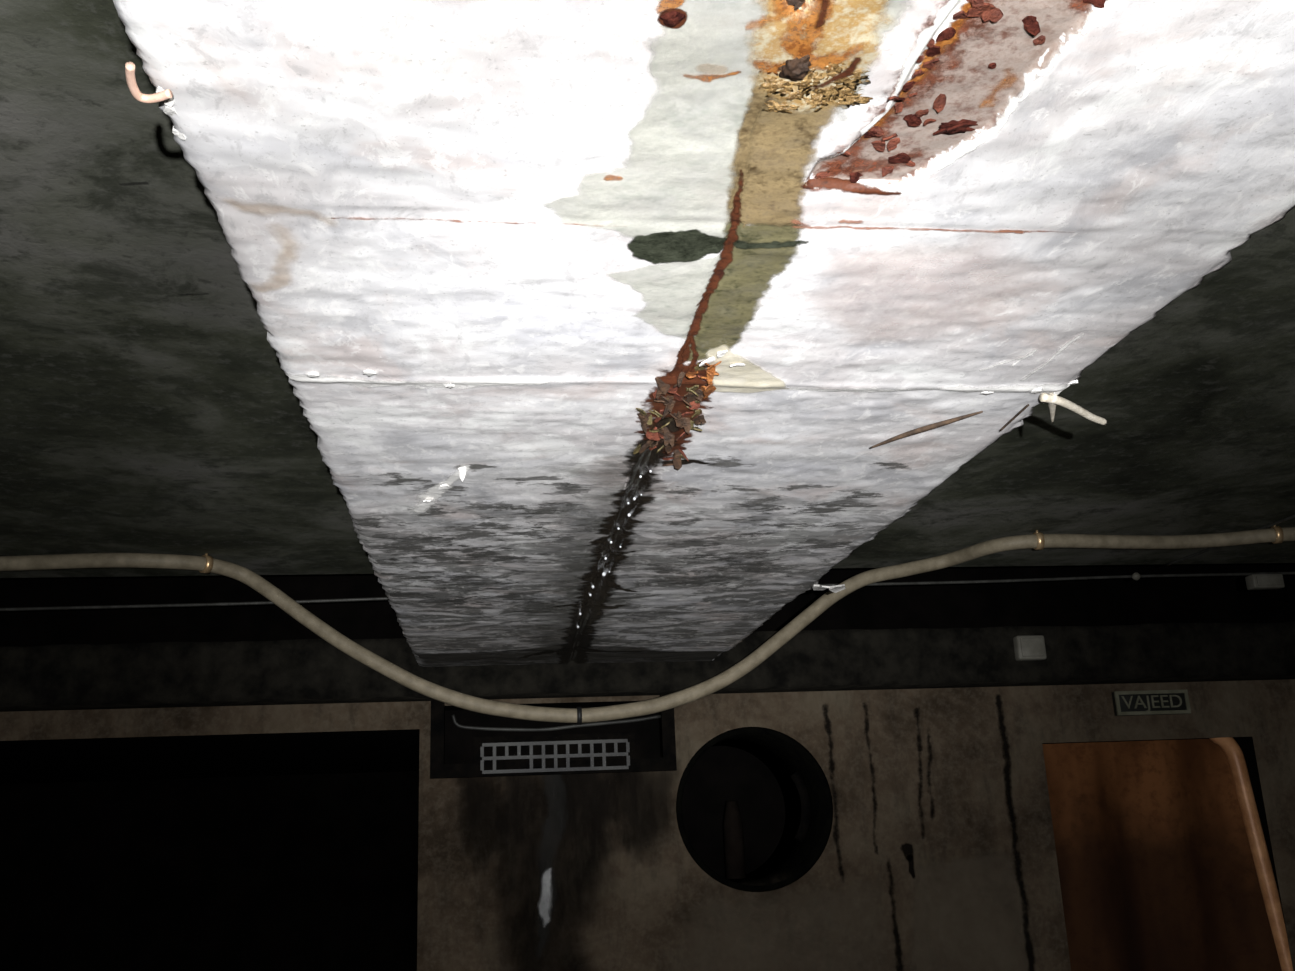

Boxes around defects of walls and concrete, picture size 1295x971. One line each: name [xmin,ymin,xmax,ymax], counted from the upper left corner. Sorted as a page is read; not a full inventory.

rust [684,0,890,114]
spalling [786,0,806,12]
spalling [801,0,1115,195]
crack [670,170,743,376]
rust [633,361,722,470]
crack [521,417,711,664]
leakage [458,746,671,971]
crack [823,706,844,876]
crack [863,705,903,971]
crack [915,708,934,837]
crack [996,695,1035,971]